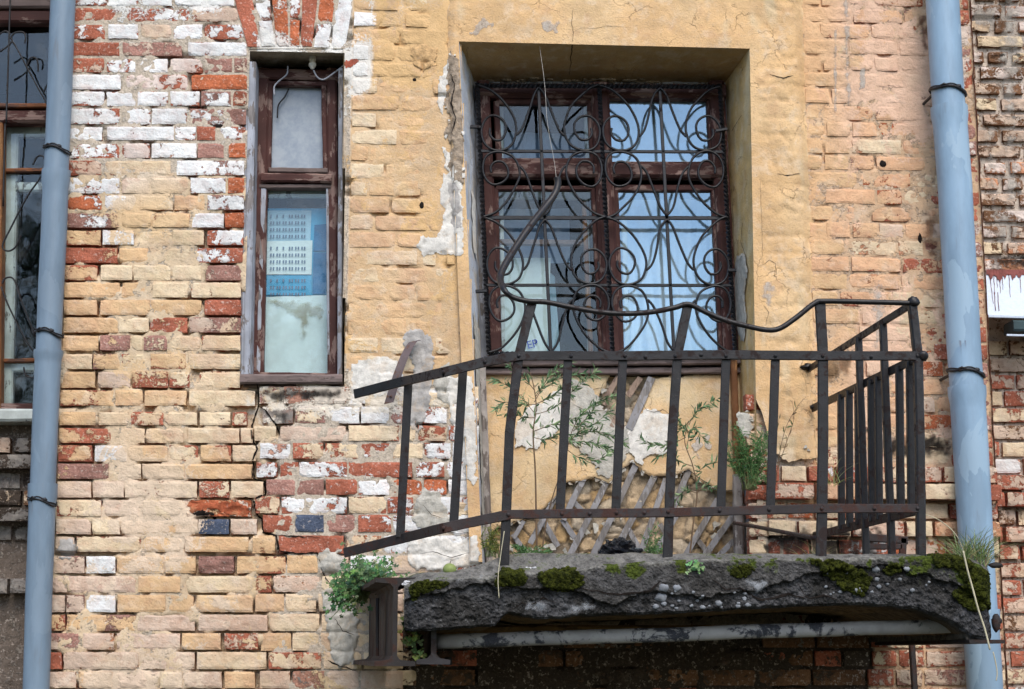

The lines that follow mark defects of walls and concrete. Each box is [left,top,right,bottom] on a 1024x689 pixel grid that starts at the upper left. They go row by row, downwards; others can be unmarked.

spalling [410,44,477,259]
crack [242,384,330,583]
spalling [407,312,486,572]
peeling [515,380,731,491]
spalling [736,410,754,438]